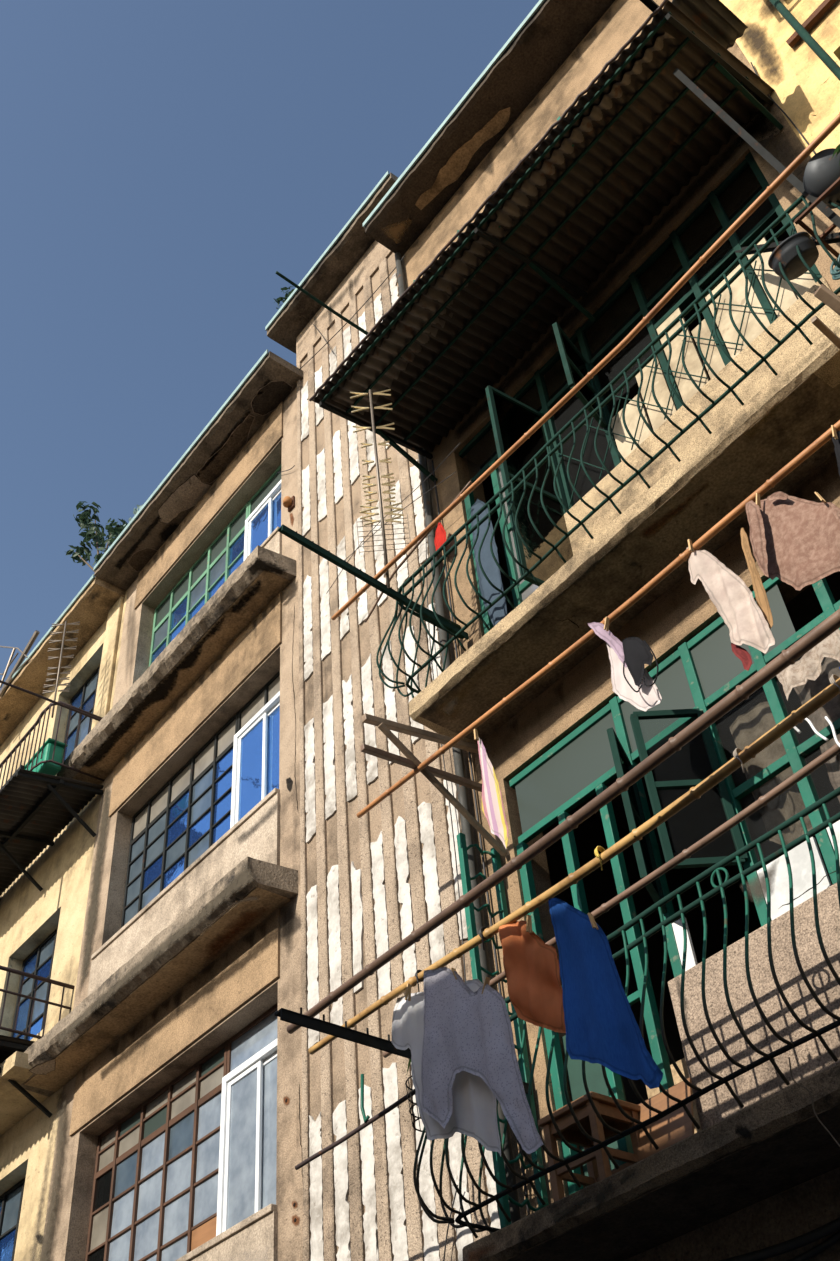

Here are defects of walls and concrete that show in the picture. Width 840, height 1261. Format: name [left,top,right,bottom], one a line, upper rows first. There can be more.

peeling [415,107,511,211]